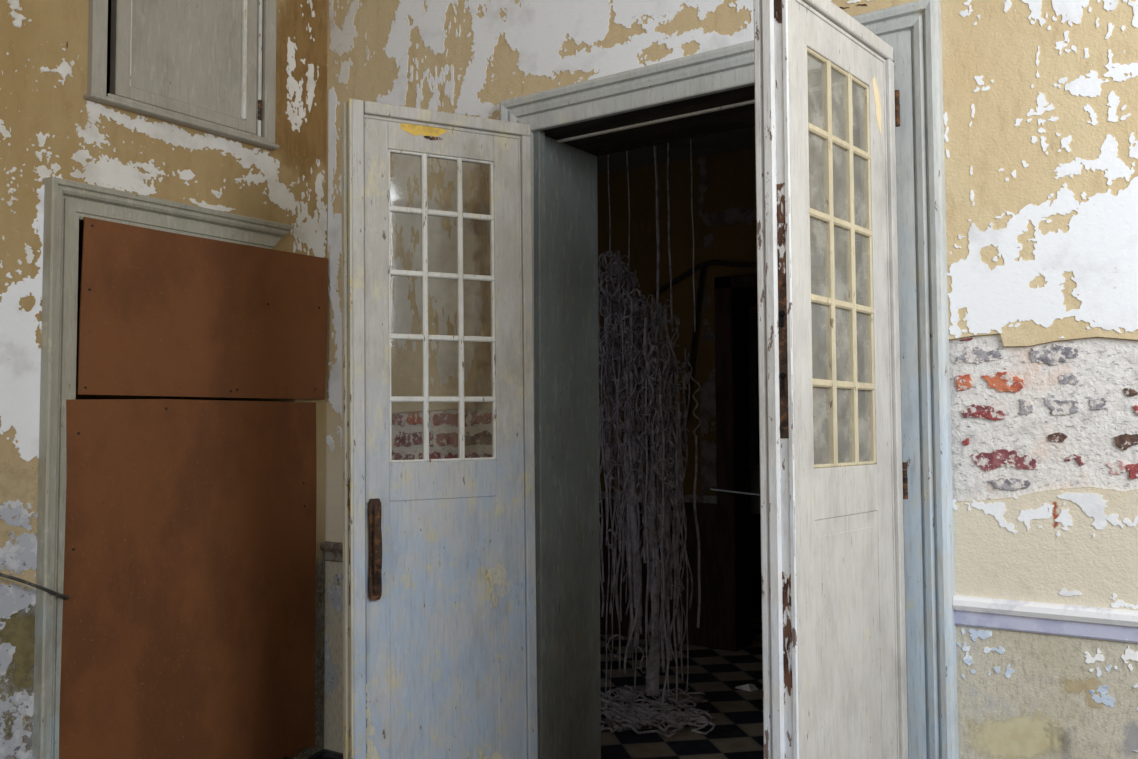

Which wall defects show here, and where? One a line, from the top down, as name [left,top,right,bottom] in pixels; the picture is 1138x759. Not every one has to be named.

peeling [872,76,882,136]
peeling [0,0,757,462]
peeling [0,499,38,759]
peeling [324,571,343,700]
peeling [957,628,1014,679]
peeling [1084,645,1138,708]